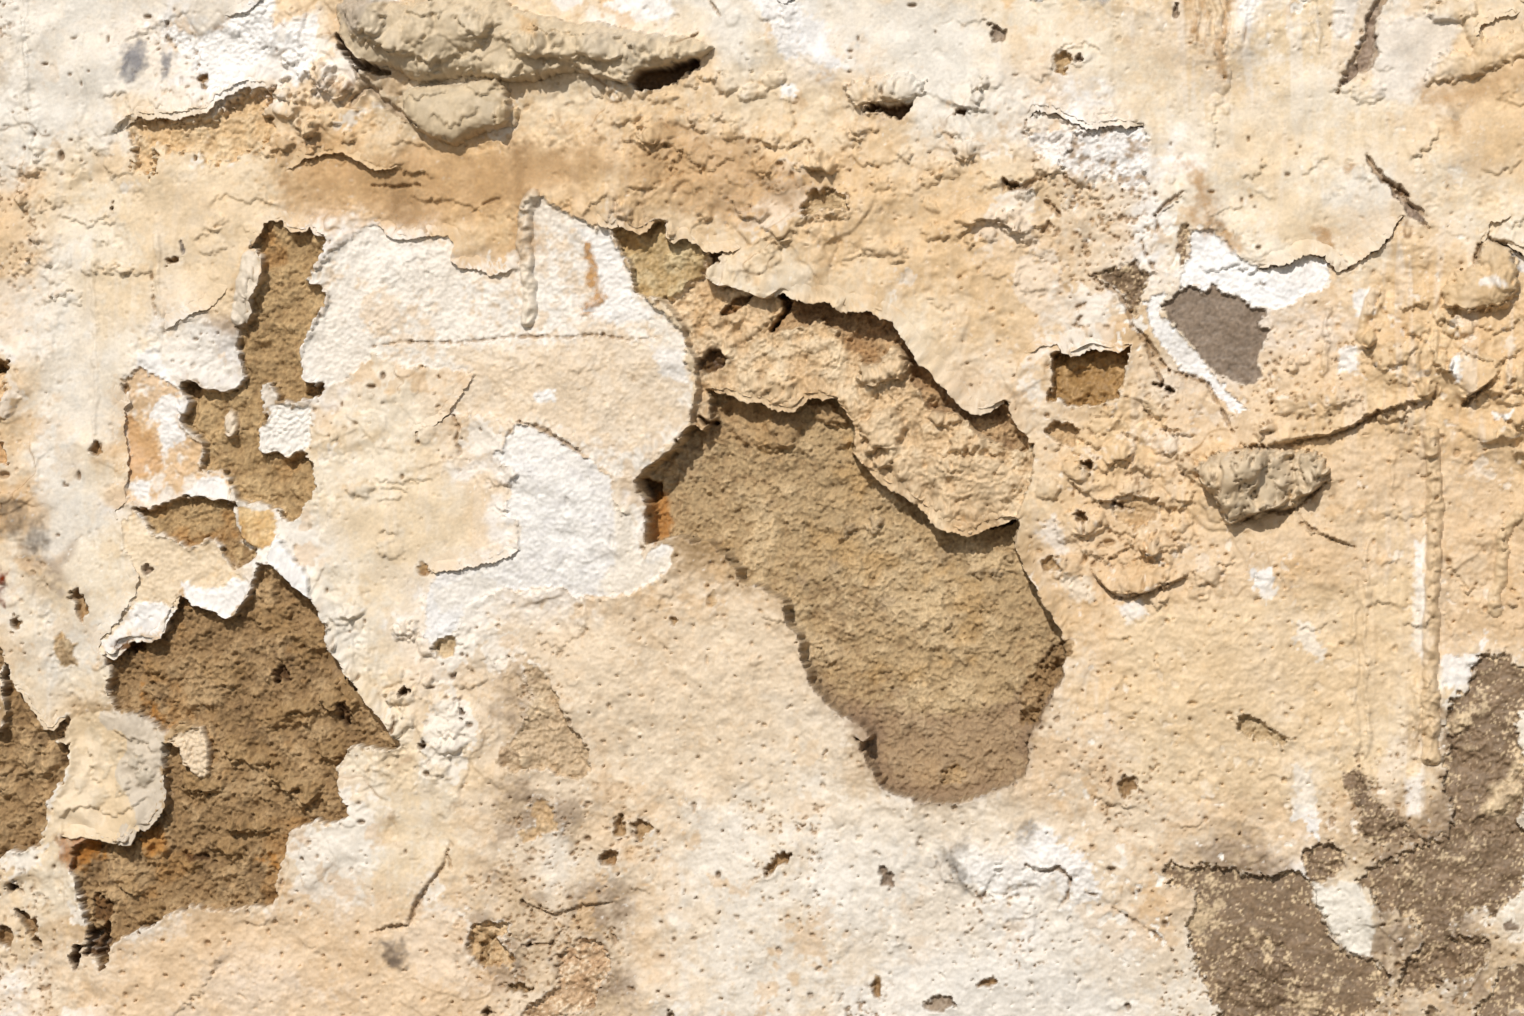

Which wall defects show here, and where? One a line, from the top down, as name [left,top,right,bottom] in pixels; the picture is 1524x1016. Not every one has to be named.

crack [1336,0,1390,95]
peeling [1088,216,1403,417]
spalling [0,193,1132,973]
spalling [1111,495,1161,535]
peeling [1114,774,1141,800]
spalling [1162,652,1524,1016]